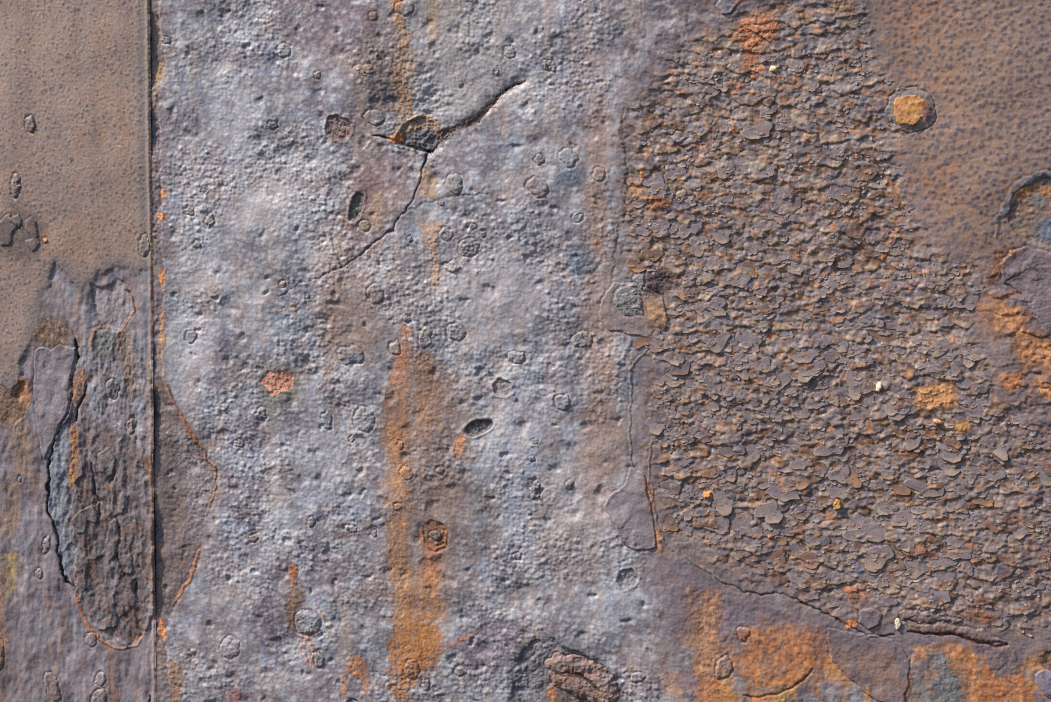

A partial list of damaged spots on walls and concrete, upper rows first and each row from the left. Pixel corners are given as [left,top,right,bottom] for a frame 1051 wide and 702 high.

corrosion [354,0,414,126]
crack [468,81,526,127]
crack [305,135,443,282]
spalling [995,171,1051,247]
corrosion [256,370,295,421]
corrosion [591,0,1051,702]
crack [46,339,144,649]
spalling [50,432,147,614]
corrosion [350,315,478,701]
corrosion [340,656,368,702]
spalling [509,636,624,702]
crack [743,668,814,699]